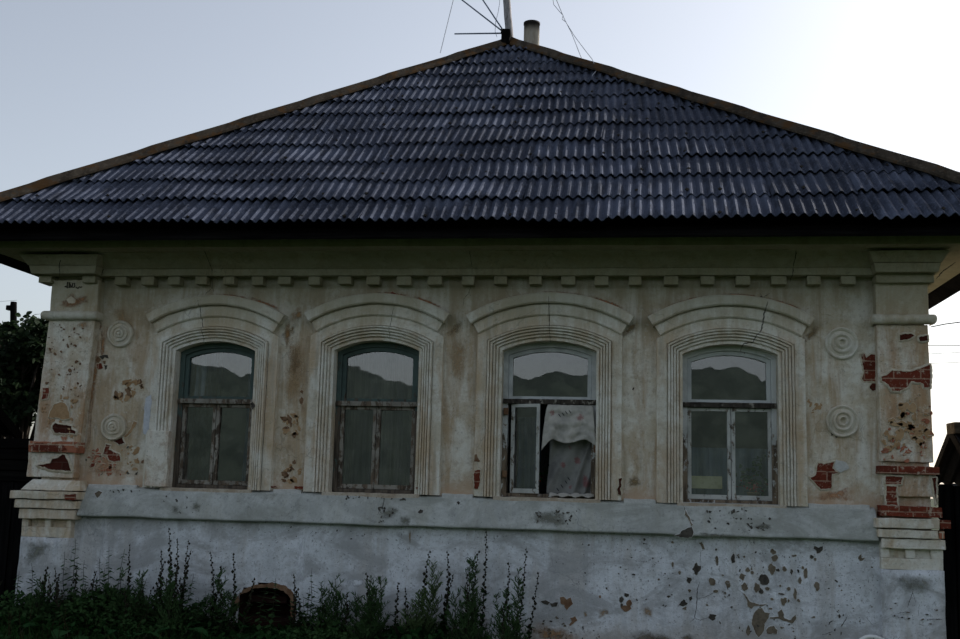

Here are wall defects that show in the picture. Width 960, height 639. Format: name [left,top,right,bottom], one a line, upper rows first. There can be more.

spalling [898,332,929,343]
peeling [95,354,109,370]
peeling [29,323,86,474]
spalling [85,379,152,477]
peeling [859,352,934,463]
spalling [808,459,849,491]
spalling [883,474,904,506]
spalling [930,476,938,506]
peeling [657,562,701,610]
peeling [667,509,861,639]